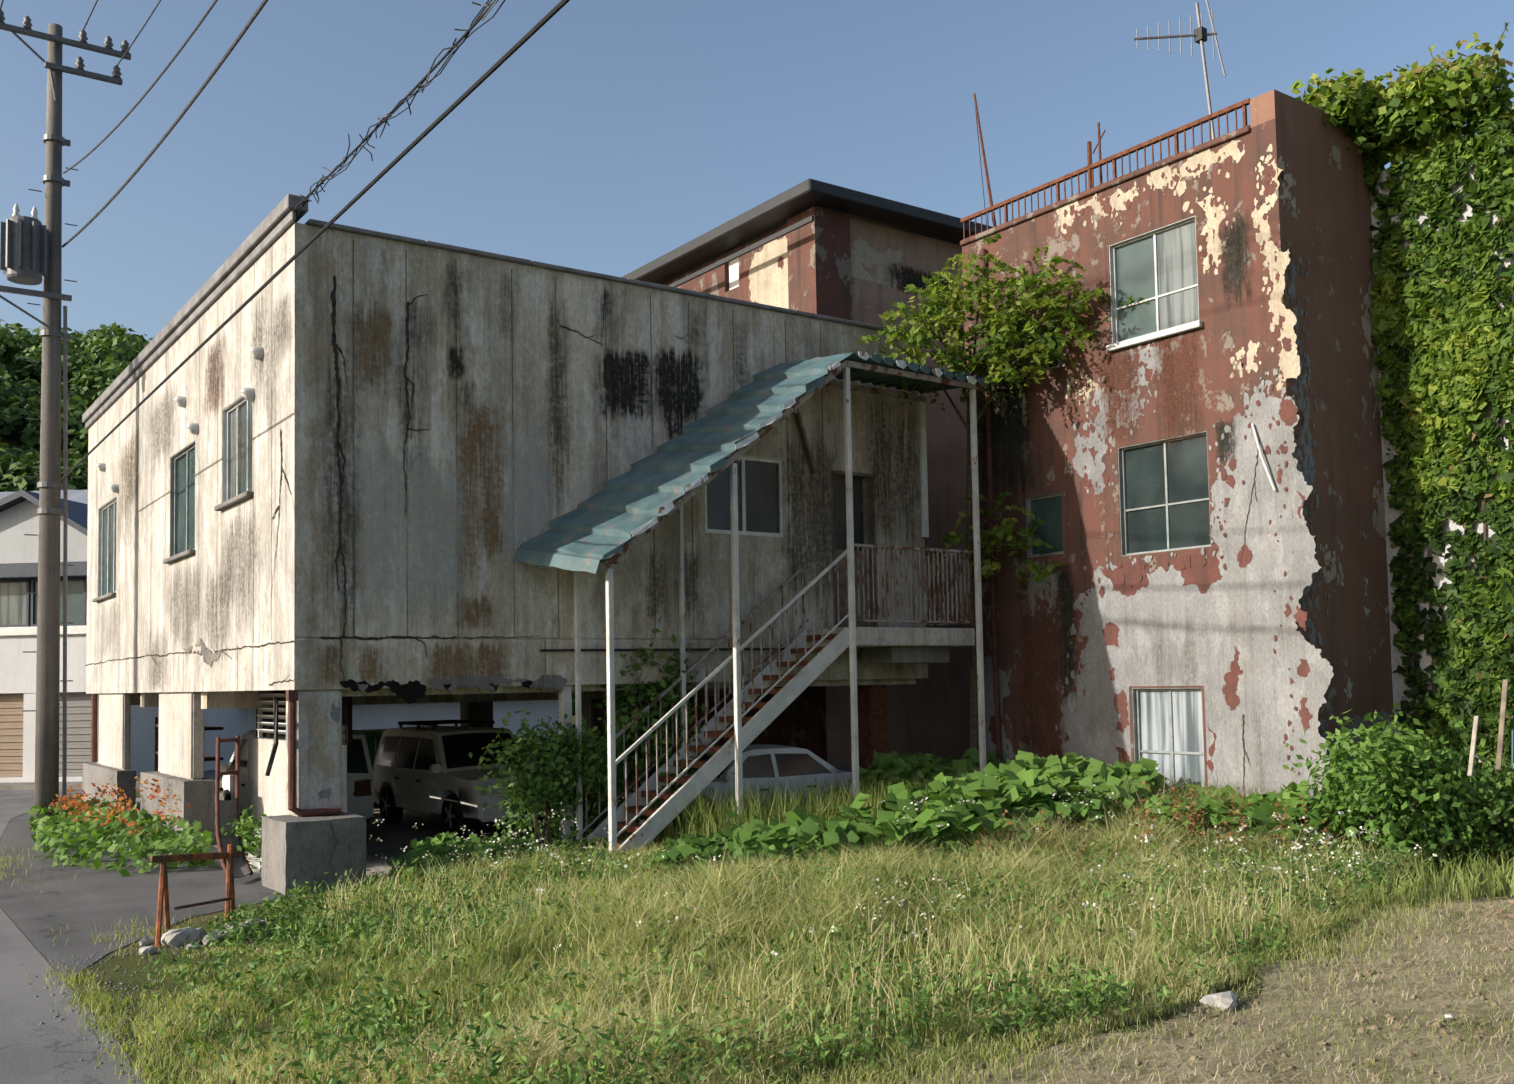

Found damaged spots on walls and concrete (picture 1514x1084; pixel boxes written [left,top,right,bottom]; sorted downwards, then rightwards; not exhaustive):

mould [598,348,704,440]
crack [85,275,542,686]
corrosion [461,409,501,564]
peeling [1031,140,1395,831]
peeling [285,674,567,799]